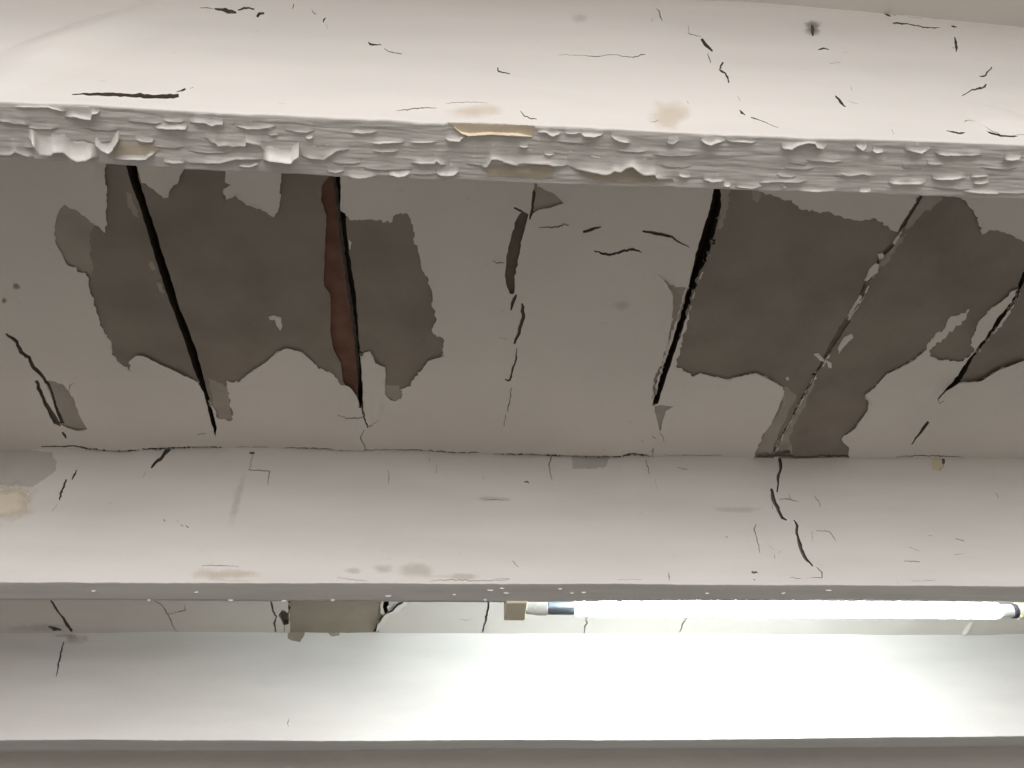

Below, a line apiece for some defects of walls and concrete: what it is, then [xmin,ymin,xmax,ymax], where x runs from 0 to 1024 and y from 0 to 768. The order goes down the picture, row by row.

crack [6,333,722,510]
peeling [0,103,1024,459]
crack [494,189,689,422]
crack [754,196,922,579]
crack [897,272,1024,470]
peeling [282,595,408,642]